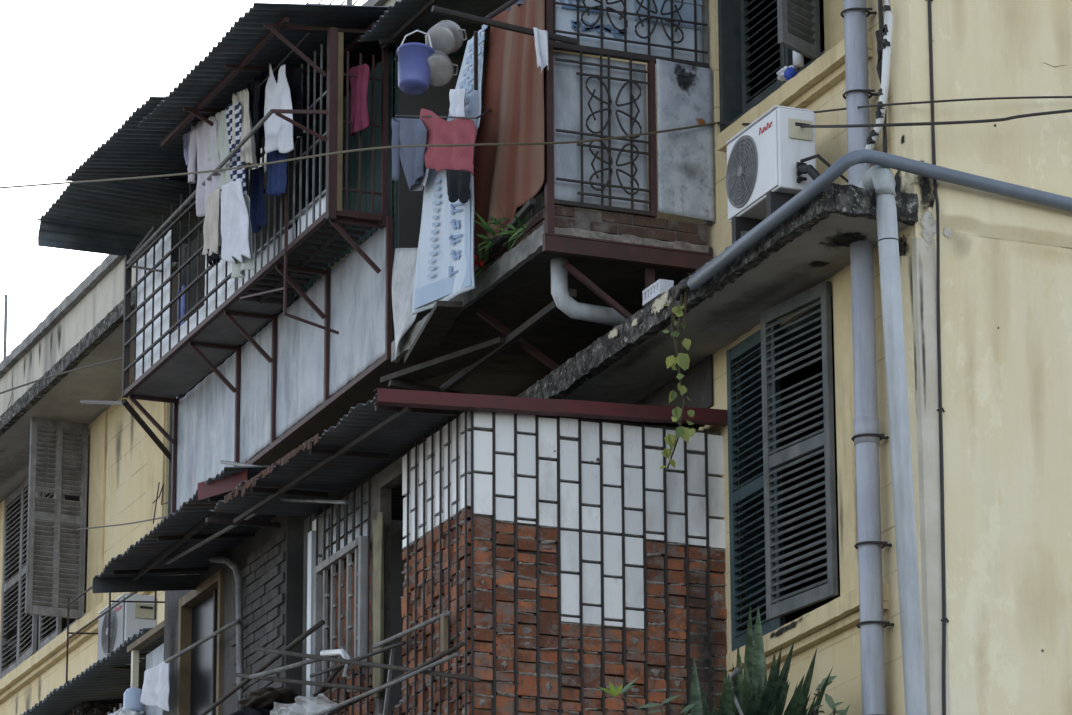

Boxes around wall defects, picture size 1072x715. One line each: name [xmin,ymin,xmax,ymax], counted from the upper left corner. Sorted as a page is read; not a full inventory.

leakage [894,170,905,192]
leakage [918,175,939,210]
leakage [820,232,867,249]
leakage [899,235,909,256]
leakage [914,347,925,387]